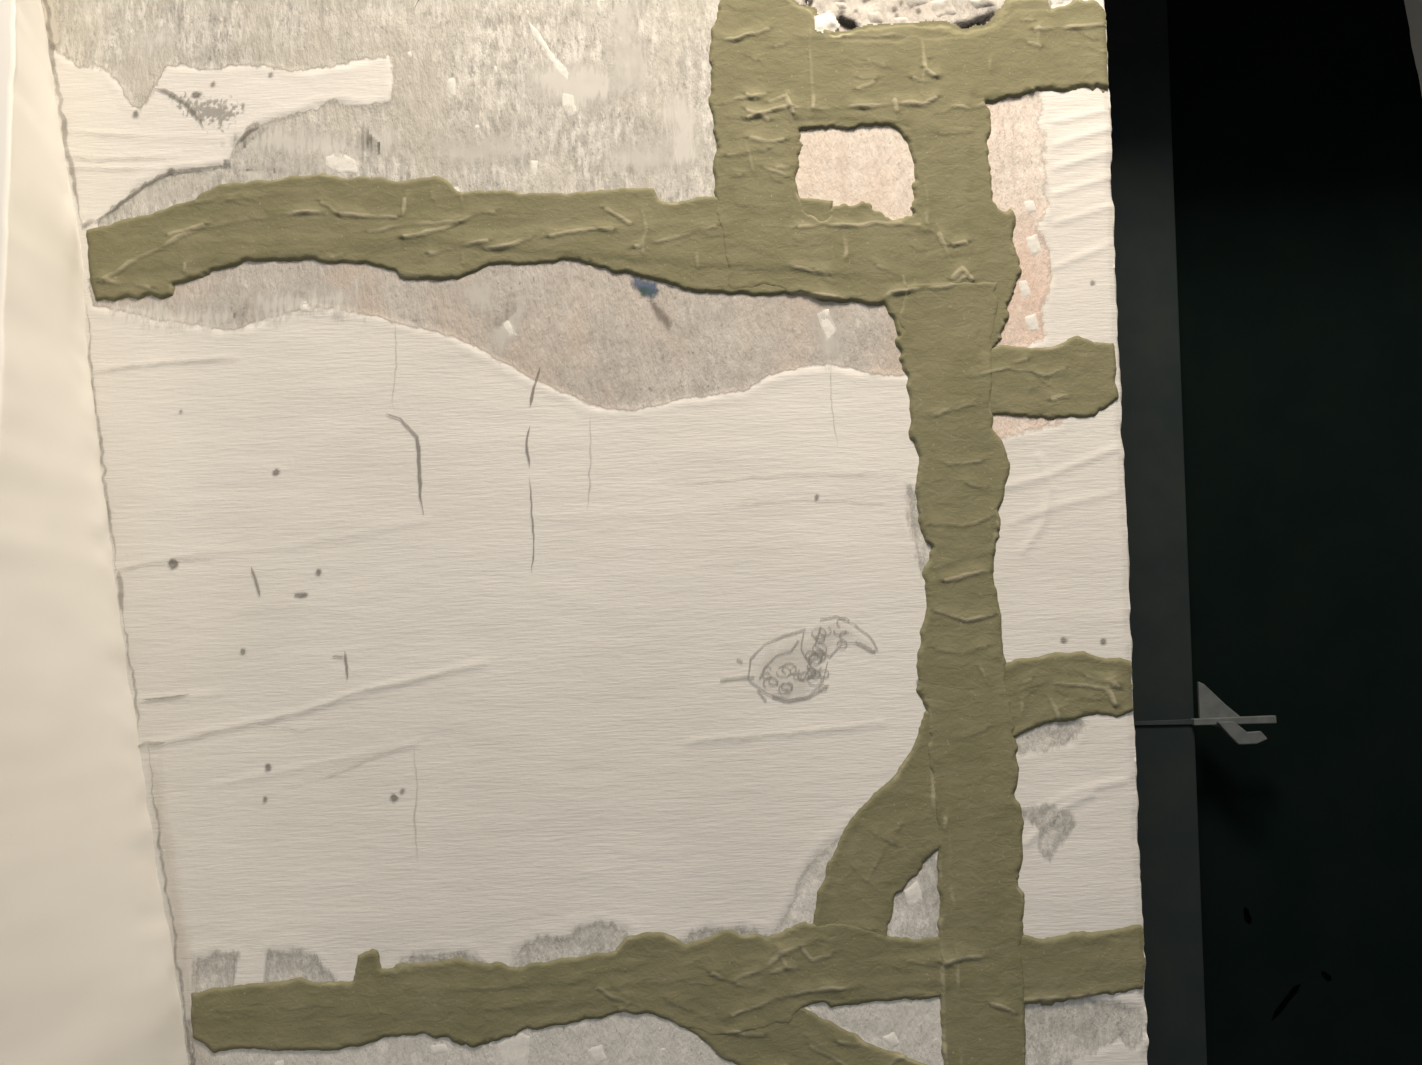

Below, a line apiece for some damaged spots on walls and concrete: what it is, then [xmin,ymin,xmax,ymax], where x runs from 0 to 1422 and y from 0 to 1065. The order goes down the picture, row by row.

spalling [795,0,1005,33]
flaking render [41,0,720,227]
flaking render [795,126,915,220]
flaking render [986,94,1051,347]
flaking render [89,260,906,411]
flaking render [196,951,238,993]
flaking render [264,951,334,983]
flaking render [515,922,628,967]
flaking render [184,1012,736,1065]
flaking render [808,997,944,1065]
flaking render [1025,996,1143,1065]